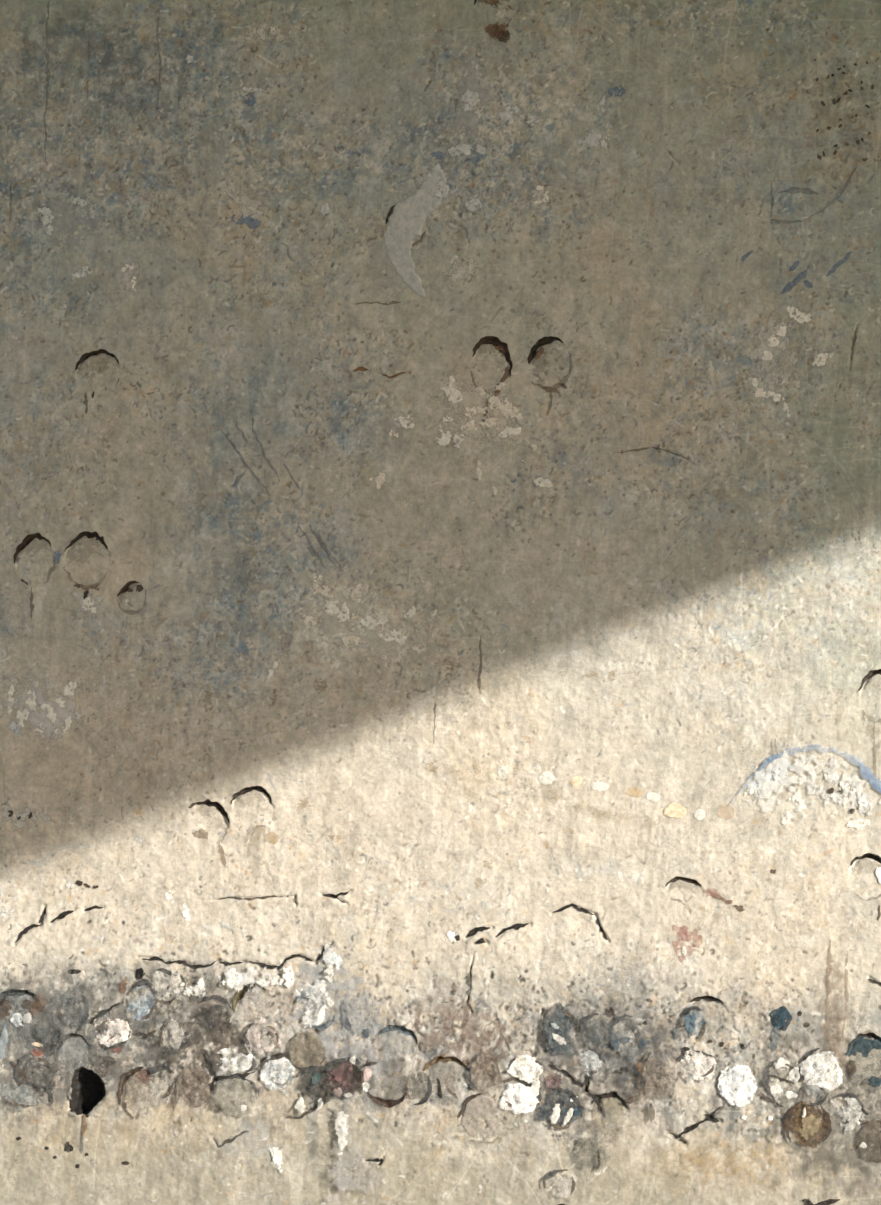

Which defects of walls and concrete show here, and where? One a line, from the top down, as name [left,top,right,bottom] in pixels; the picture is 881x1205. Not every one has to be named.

rust [484,22,510,43]
peeling [384,62,540,297]
peeling [824,773,875,830]
crack [15,905,103,943]
crack [143,944,332,970]
crack [219,891,349,904]
crack [467,903,608,1008]
water stain [0,972,254,1118]
water stain [289,961,404,1110]
water stain [825,940,881,1080]
spalling [44,1067,108,1168]
water stain [801,1114,822,1140]